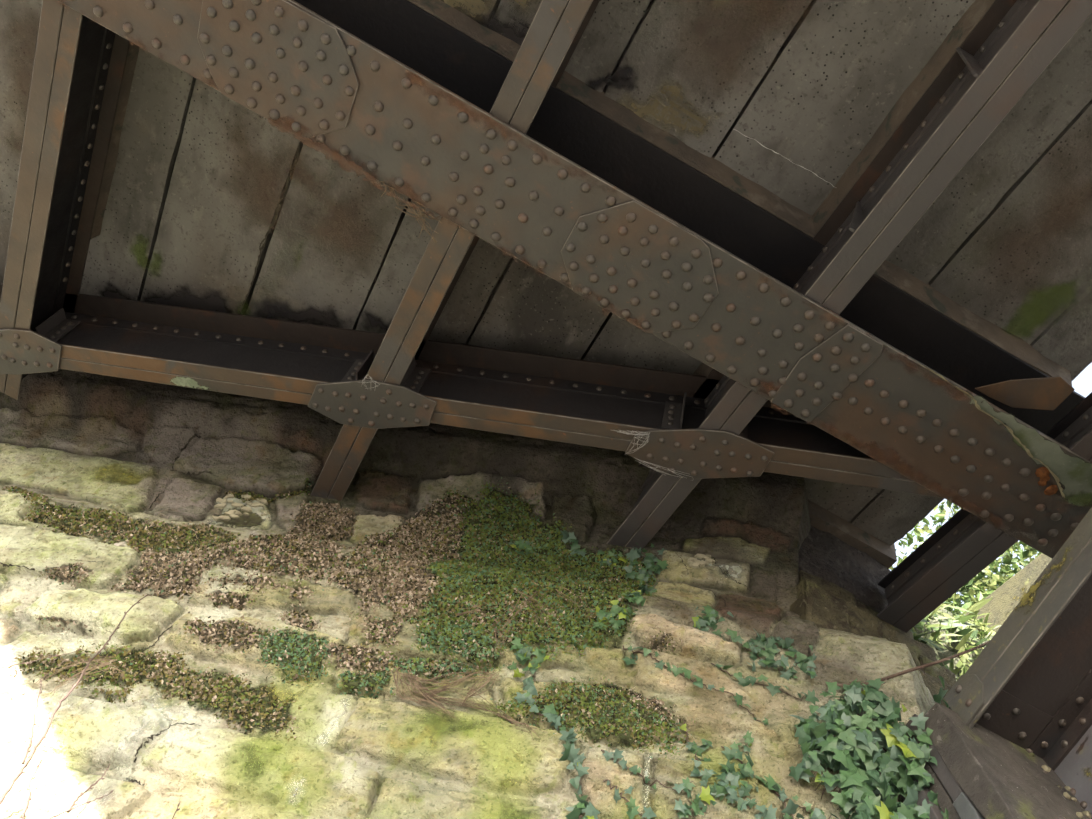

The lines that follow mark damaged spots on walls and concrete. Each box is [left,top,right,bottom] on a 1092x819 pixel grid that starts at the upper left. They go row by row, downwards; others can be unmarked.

crack [146,434,212,511]
peeling [919,364,1092,506]